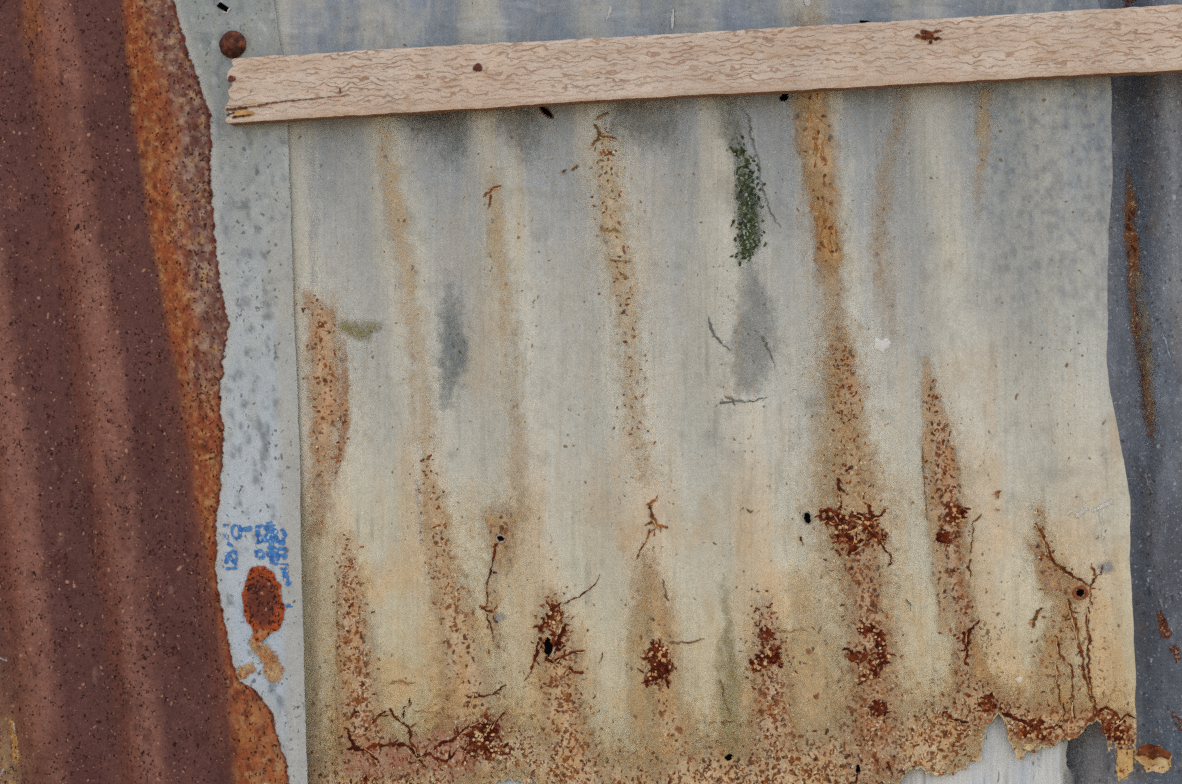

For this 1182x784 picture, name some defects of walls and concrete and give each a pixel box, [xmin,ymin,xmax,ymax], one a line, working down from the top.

rust [0,0,289,784]
rust [301,91,1172,784]
rust [1156,611,1180,663]